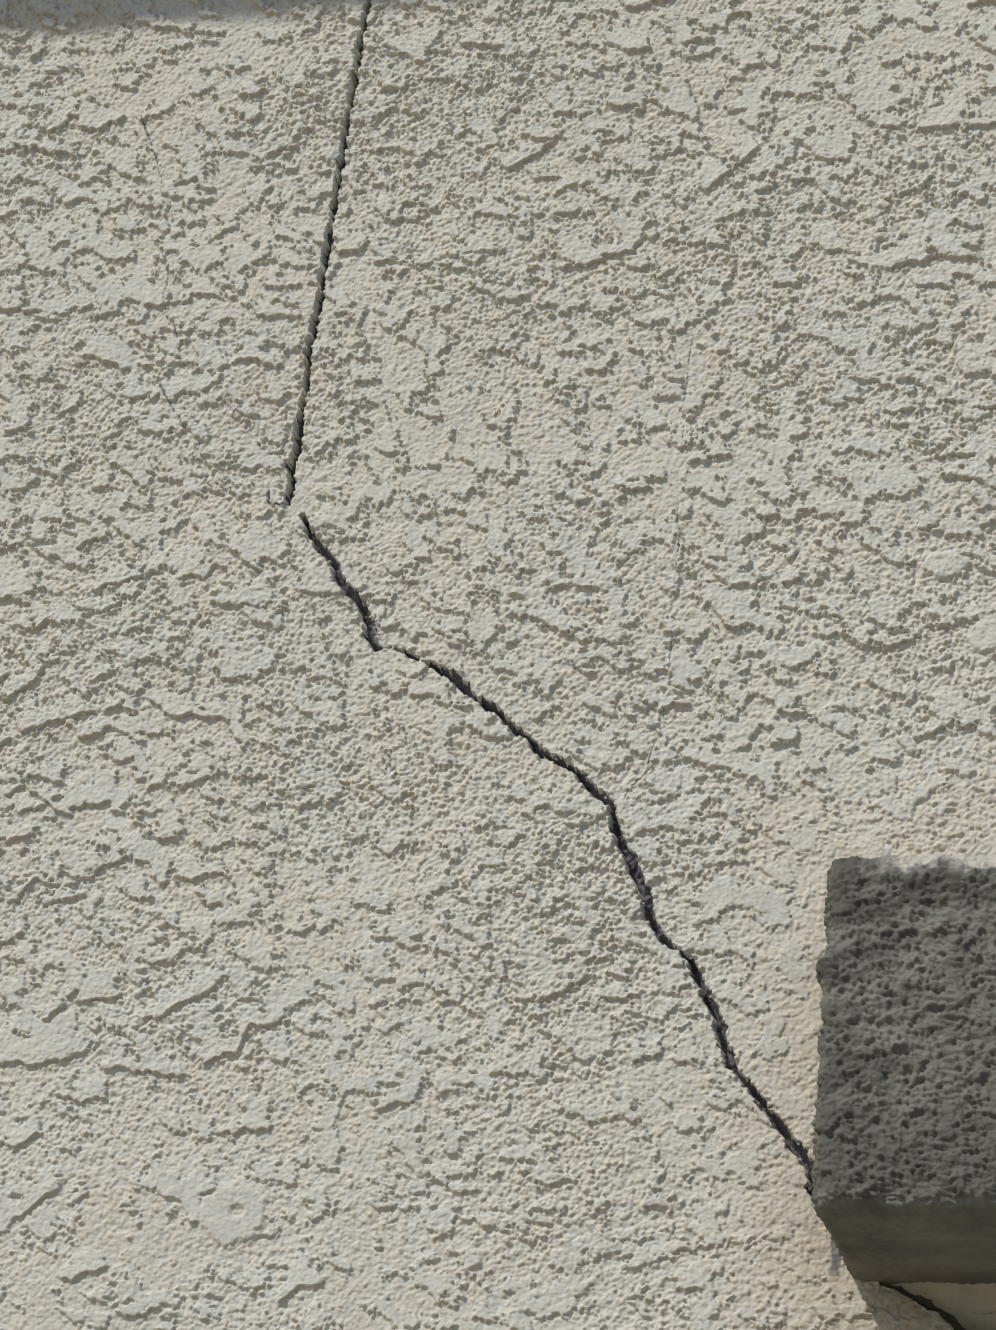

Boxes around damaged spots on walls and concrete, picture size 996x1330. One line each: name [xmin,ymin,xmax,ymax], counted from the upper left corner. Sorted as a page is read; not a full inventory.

crack [268,6,814,1196]
crack [881,1284,966,1330]